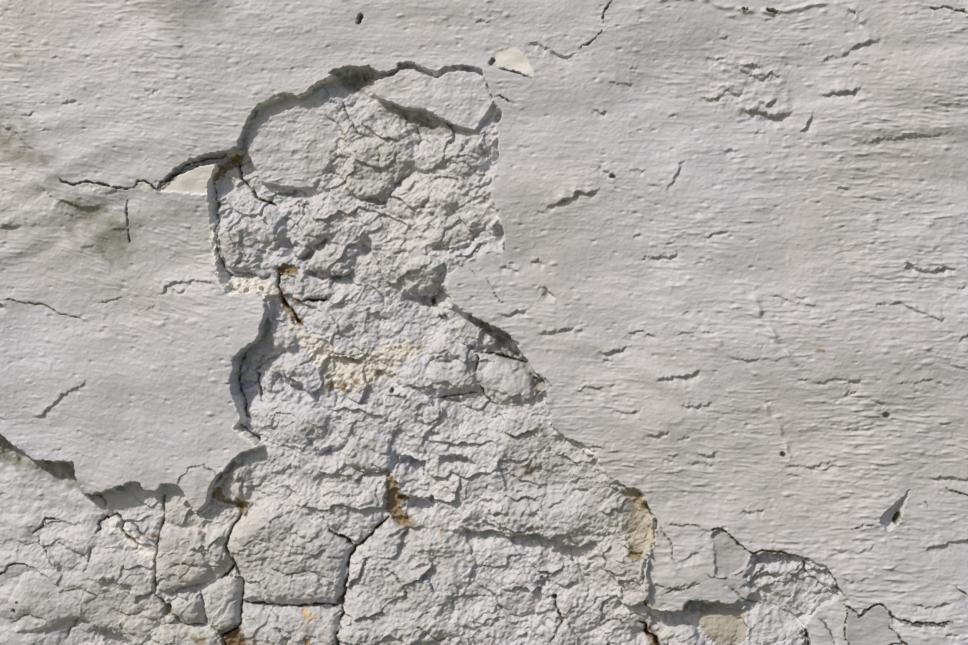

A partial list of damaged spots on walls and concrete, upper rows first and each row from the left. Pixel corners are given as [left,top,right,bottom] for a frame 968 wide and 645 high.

spalling [489,47,534,76]
crack [61,155,313,241]
crack [214,188,233,277]
crack [326,101,383,184]
crack [427,162,487,185]
spalling [0,61,842,645]
crack [0,464,390,645]
crack [381,568,408,599]
crack [550,597,564,644]
crack [597,619,659,645]
crack [664,524,954,645]
peeling [845,606,905,645]